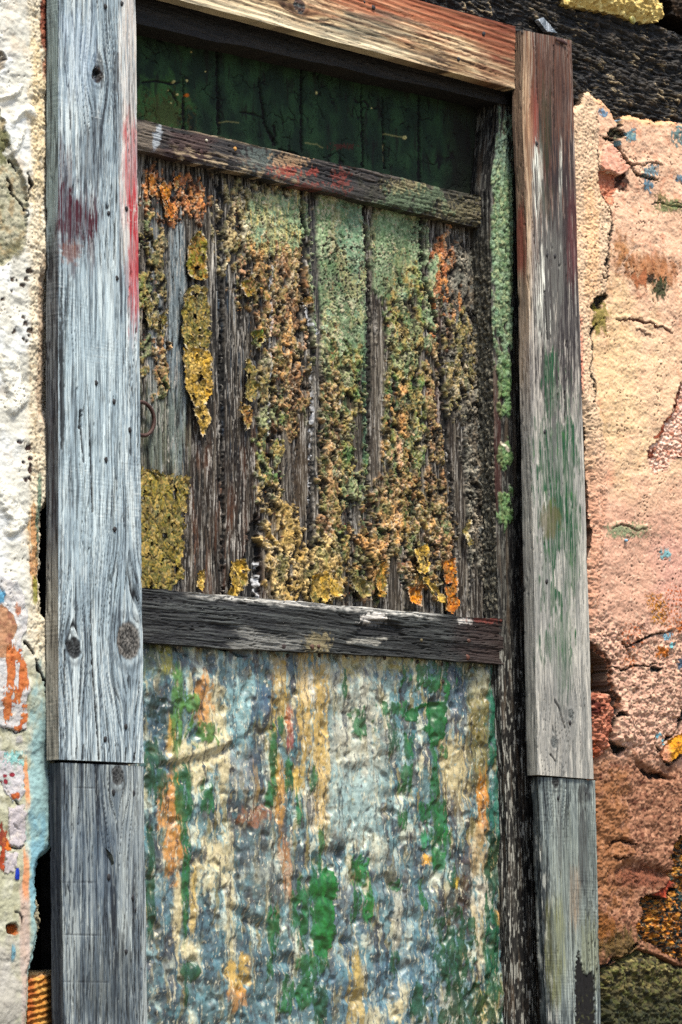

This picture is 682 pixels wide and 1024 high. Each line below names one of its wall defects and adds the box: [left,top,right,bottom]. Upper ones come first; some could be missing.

crack [597,137,682,208]
crack [599,189,613,279]
flaking render [647,383,682,475]
crack [609,633,662,673]
flaking render [590,642,622,759]
flaking render [617,867,673,897]